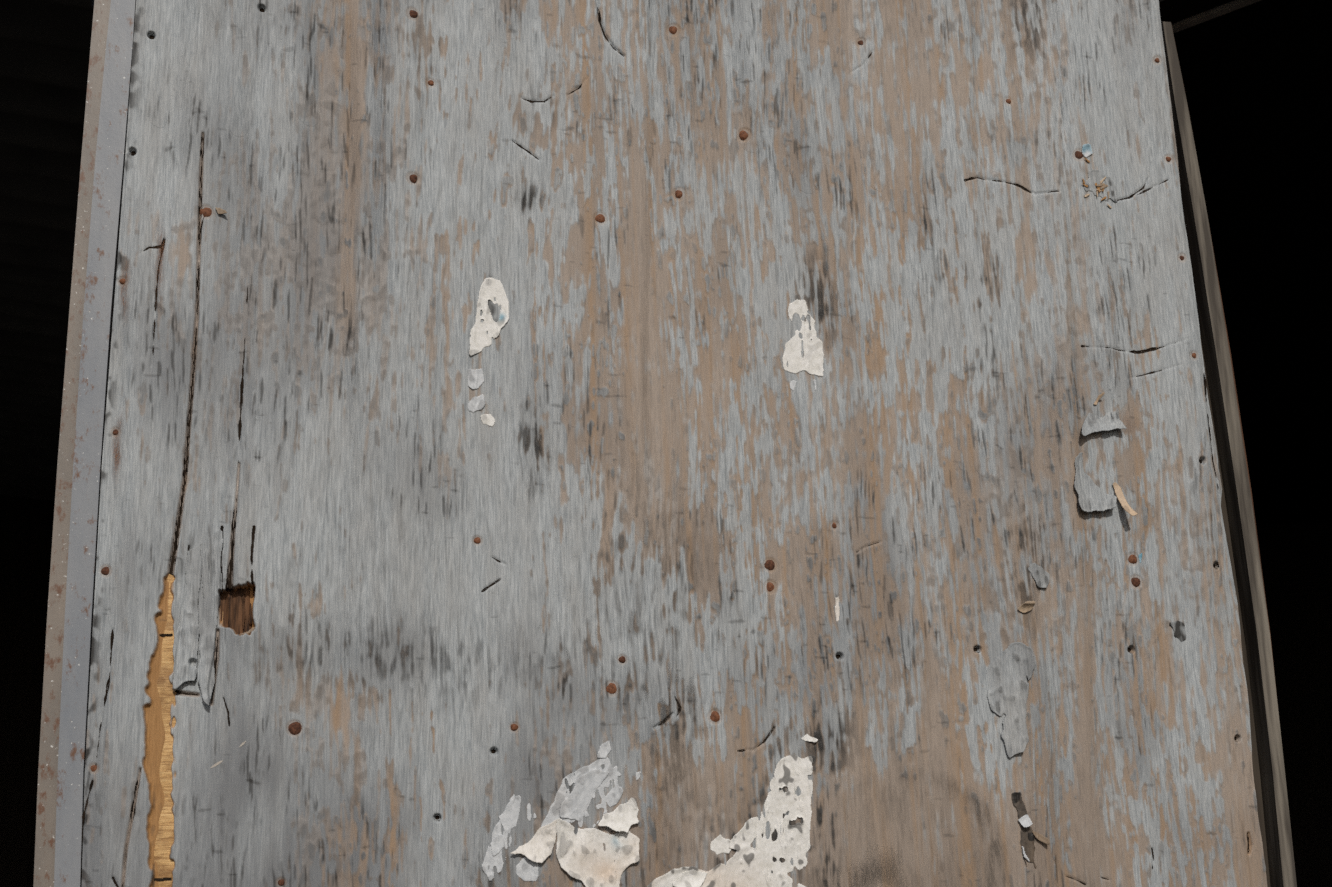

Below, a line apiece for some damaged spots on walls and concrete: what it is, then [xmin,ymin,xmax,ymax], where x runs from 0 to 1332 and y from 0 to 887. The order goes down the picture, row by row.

crack [964,177,1059,193]
crack [1117,179,1168,201]
crack [136,238,166,353]
crack [169,132,256,605]
peeling [468,278,509,427]
peeling [782,299,824,391]
peeling [1082,393,1127,436]
crack [1081,345,1165,377]
peeling [1074,452,1138,516]
peeling [482,741,641,887]
peeling [647,734,818,887]